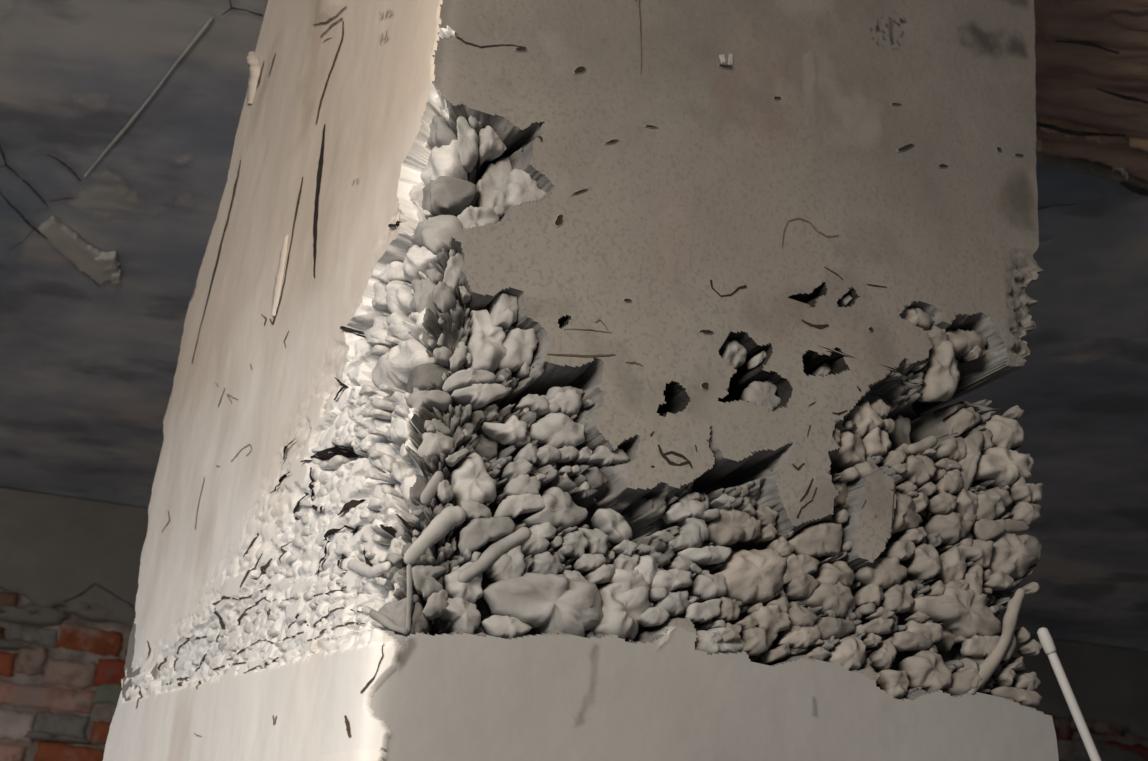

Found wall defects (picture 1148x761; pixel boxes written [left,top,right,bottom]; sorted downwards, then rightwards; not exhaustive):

crack [256,53,276,89]
crack [261,21,344,348]
crack [191,160,241,364]
spalling [787,282,860,308]
crack [340,326,366,338]
crack [333,377,348,400]
spalling [656,381,690,417]
spalling [697,330,793,412]
spalling [801,346,857,377]
crack [136,439,422,708]
flaking render [0,589,136,761]
flaking render [1052,716,1148,761]